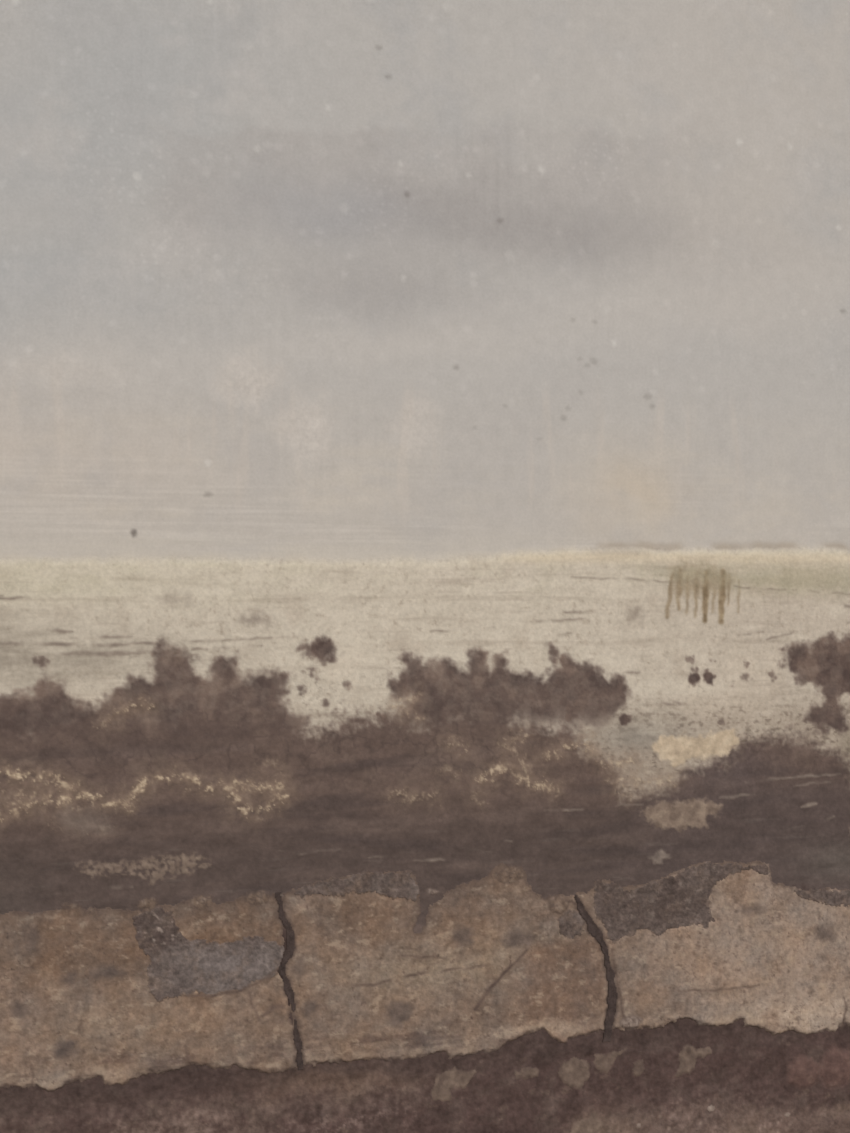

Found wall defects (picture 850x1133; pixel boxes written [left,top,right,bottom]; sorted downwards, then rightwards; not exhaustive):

corrosion [663,585,743,626]
peeling [637,793,725,836]
spalling [558,846,770,944]
spalling [132,906,285,1002]
crack [181,892,303,1072]
crack [569,895,627,1042]